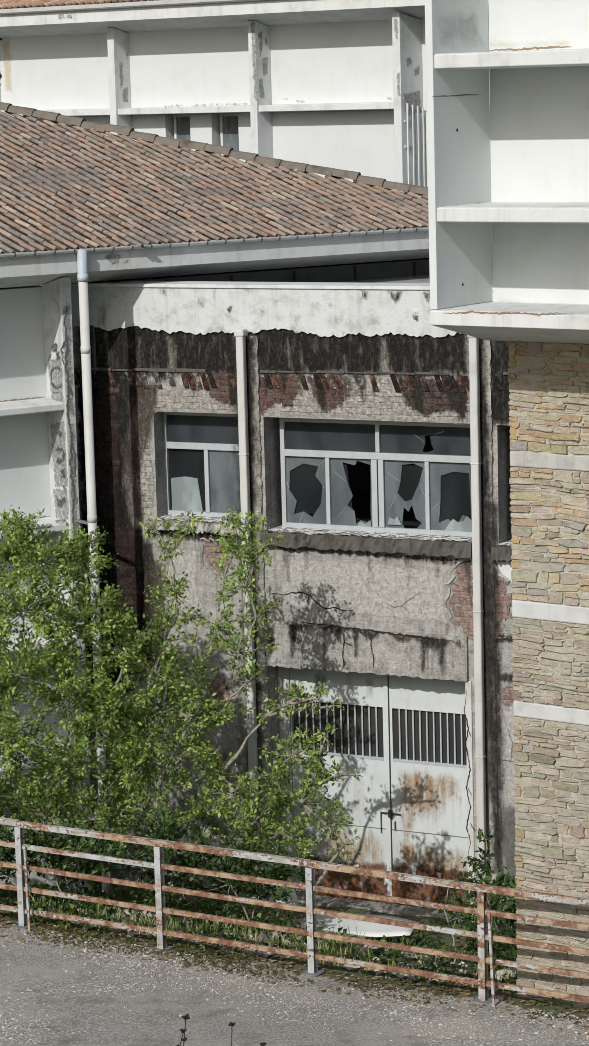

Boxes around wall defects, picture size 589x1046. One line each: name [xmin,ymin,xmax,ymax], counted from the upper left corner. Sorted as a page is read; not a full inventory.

peeling [397,58,422,115]
peeling [48,307,78,540]
flaking render [137,372,237,418]
flaking render [259,373,469,424]
flaking render [92,384,155,610]
water stain [77,325,516,888]
crack [268,592,451,667]
flaking render [280,558,474,641]
rust [408,777,453,814]